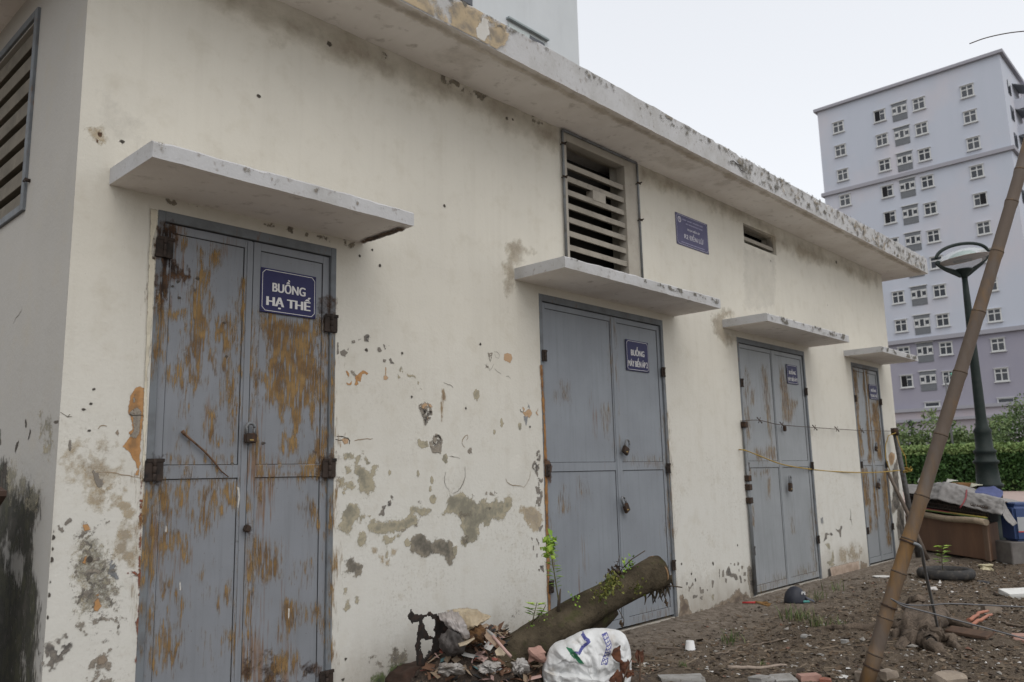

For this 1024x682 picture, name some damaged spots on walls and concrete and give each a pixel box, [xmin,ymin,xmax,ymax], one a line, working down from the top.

peeling [404,0,509,49]
peeling [116,387,144,475]
rust [127,222,345,682]
peeling [532,450,543,506]
rust [745,368,798,495]
rust [852,368,892,546]
water stain [0,456,41,682]
spalling [41,518,123,672]